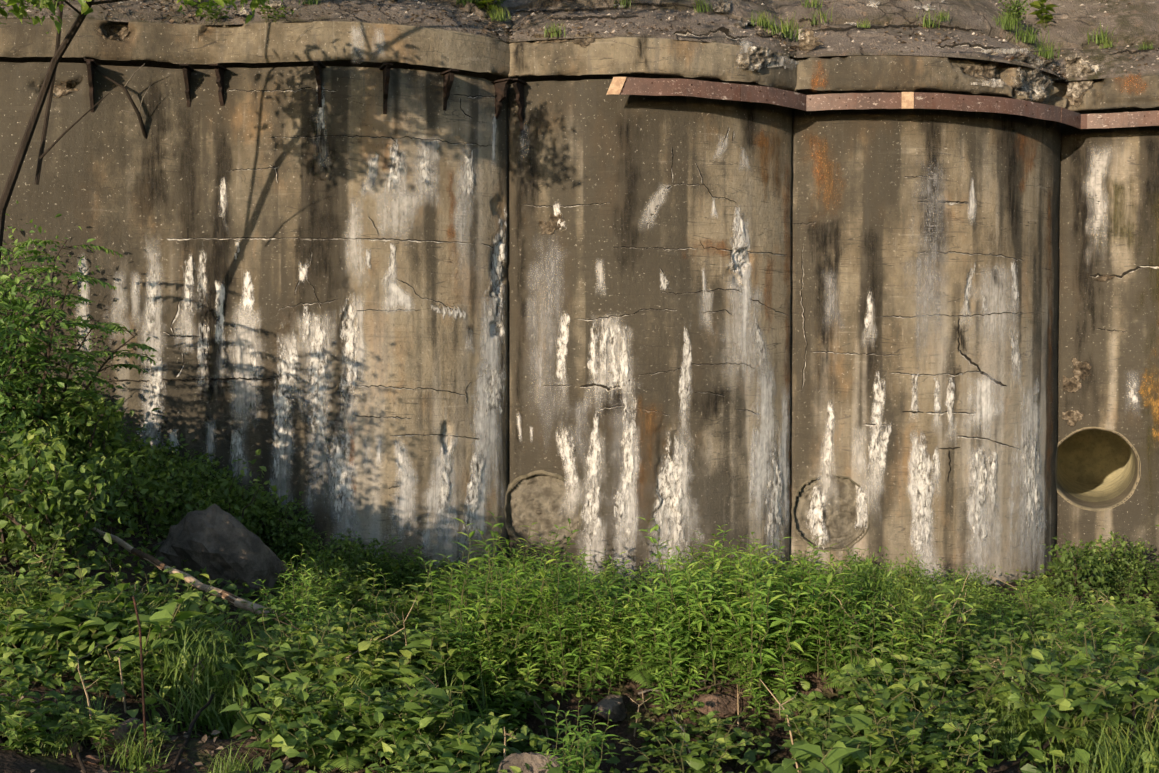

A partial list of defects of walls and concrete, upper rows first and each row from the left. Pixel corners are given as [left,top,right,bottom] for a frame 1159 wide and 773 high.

spalling [935,42,1099,107]
damp [132,253,177,451]
damp [177,126,258,413]
damp [271,85,457,511]
damp [461,117,539,545]
spalling [523,202,611,235]
damp [556,314,692,583]
crack [577,149,1022,393]
crack [863,411,1021,481]
spalling [1062,409,1084,426]
spalling [1063,358,1091,393]
crack [1090,265,1159,281]